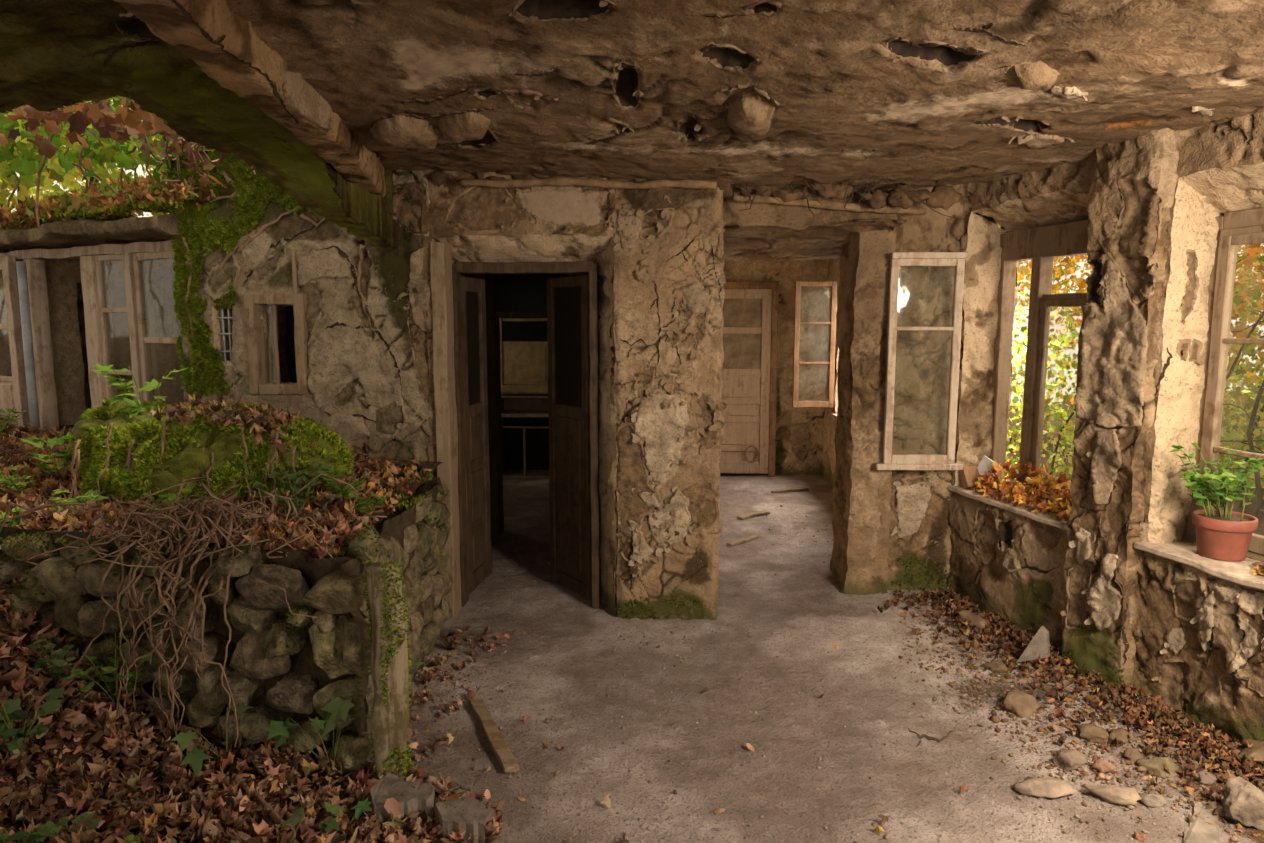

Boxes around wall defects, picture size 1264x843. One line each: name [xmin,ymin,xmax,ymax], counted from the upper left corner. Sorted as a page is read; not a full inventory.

spalling [508,0,616,22]
spalling [607,60,644,137]
spalling [675,115,704,143]
spalling [694,42,780,109]
spalling [881,36,988,68]
flaking render [971,115,1075,150]
crack [243,219,403,386]
crack [620,231,722,375]
spalling [674,288,709,360]
crack [1154,347,1173,396]
crack [323,410,376,423]
flaking render [614,363,726,578]